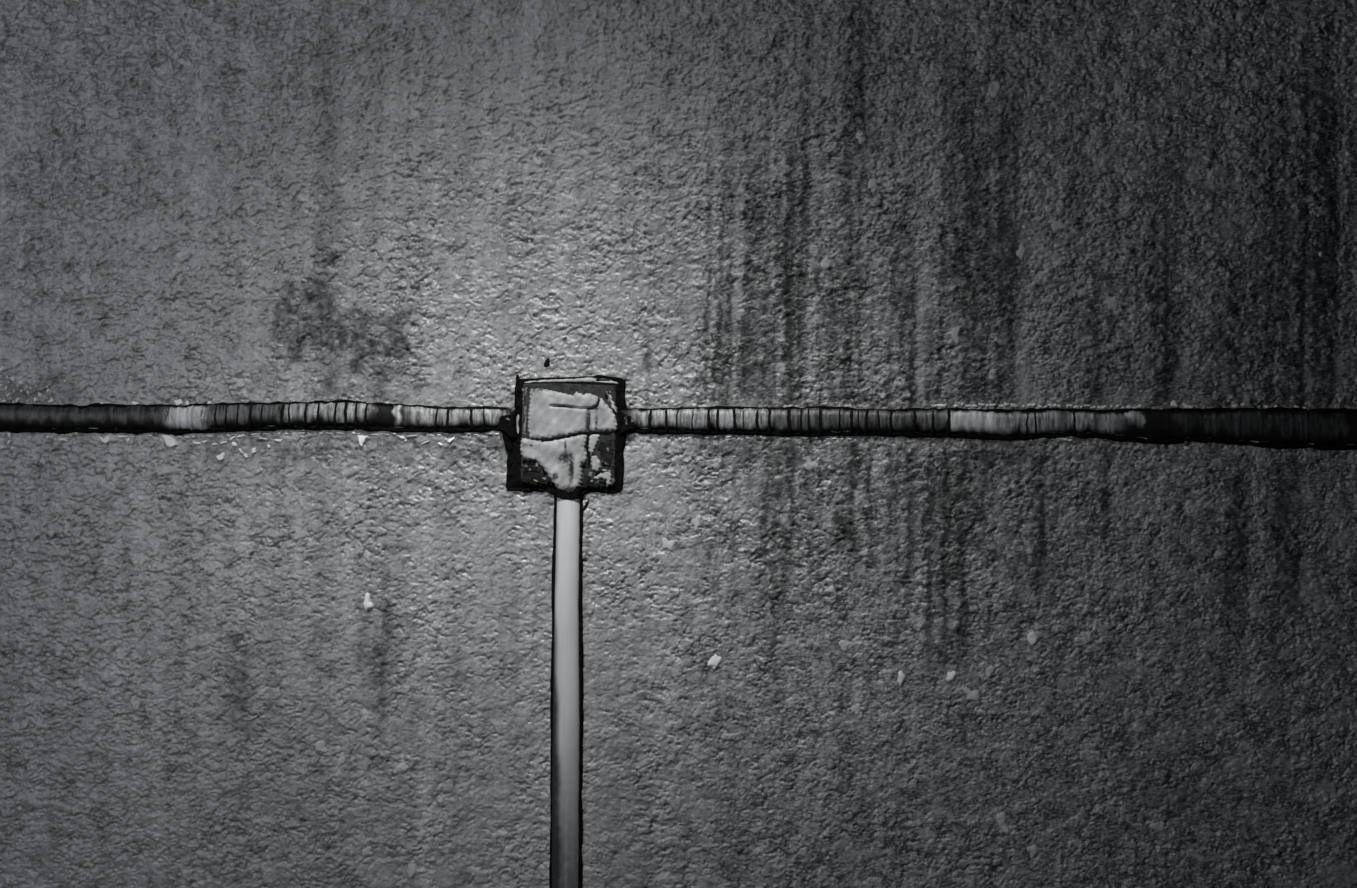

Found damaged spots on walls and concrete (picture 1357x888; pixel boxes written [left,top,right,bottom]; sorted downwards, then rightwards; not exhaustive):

leakage [710,88,861,405]
leakage [886,292,940,403]
leakage [959,142,1027,404]
leakage [1253,71,1351,401]
leakage [745,446,810,554]
leakage [834,444,870,554]
leakage [887,453,982,645]